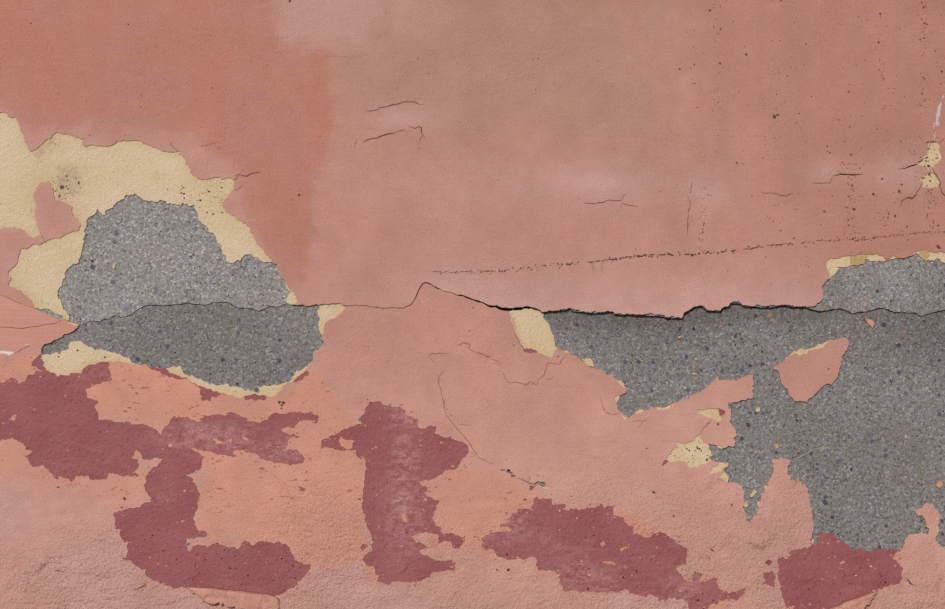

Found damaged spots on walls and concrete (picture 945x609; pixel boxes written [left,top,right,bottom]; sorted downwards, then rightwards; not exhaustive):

crack [356,101,425,144]
crack [899,141,945,204]
crack [2,282,440,353]
crack [470,299,945,319]
spalling [0,112,345,609]
crack [429,342,566,463]
spalling [320,249,945,609]